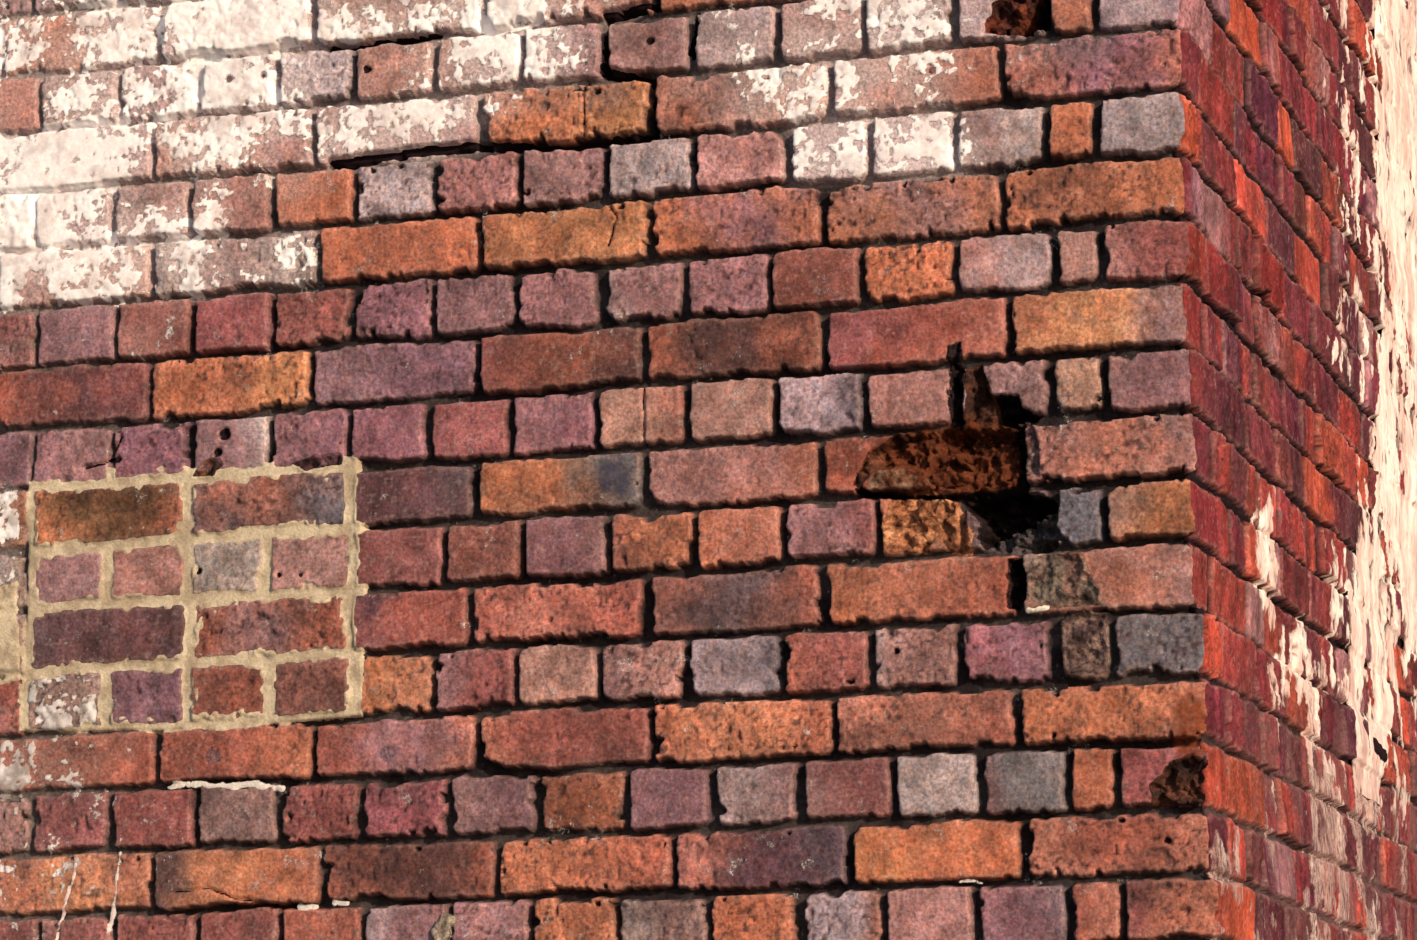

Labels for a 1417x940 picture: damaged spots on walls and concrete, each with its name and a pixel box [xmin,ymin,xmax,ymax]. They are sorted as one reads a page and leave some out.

peeling [0,0,596,396]
peeling [696,0,1063,219]
damp [1322,0,1387,497]
peeling [0,479,39,585]
spalling [193,428,235,508]
spalling [292,452,343,471]
spalling [845,364,1120,701]
peeling [0,657,194,907]
spalling [413,912,509,940]
peeling [694,836,784,878]
spalling [1149,753,1208,809]
damp [1250,487,1407,940]